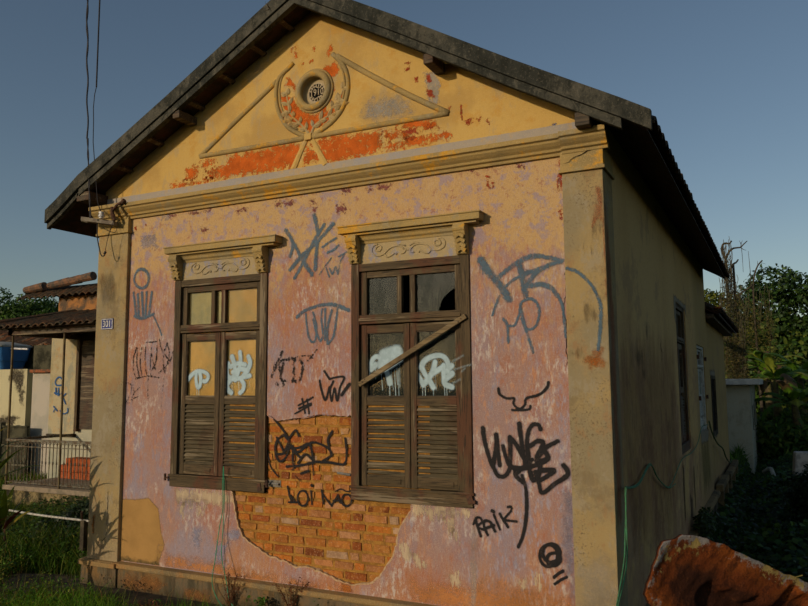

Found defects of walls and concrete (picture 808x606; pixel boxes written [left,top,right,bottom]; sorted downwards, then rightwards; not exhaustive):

peeling [280,77,335,132]
peeling [323,44,340,87]
peeling [405,61,441,103]
peeling [170,119,453,189]
damp [8,369,24,401]
rust [587,237,621,519]
flaking render [176,404,470,586]